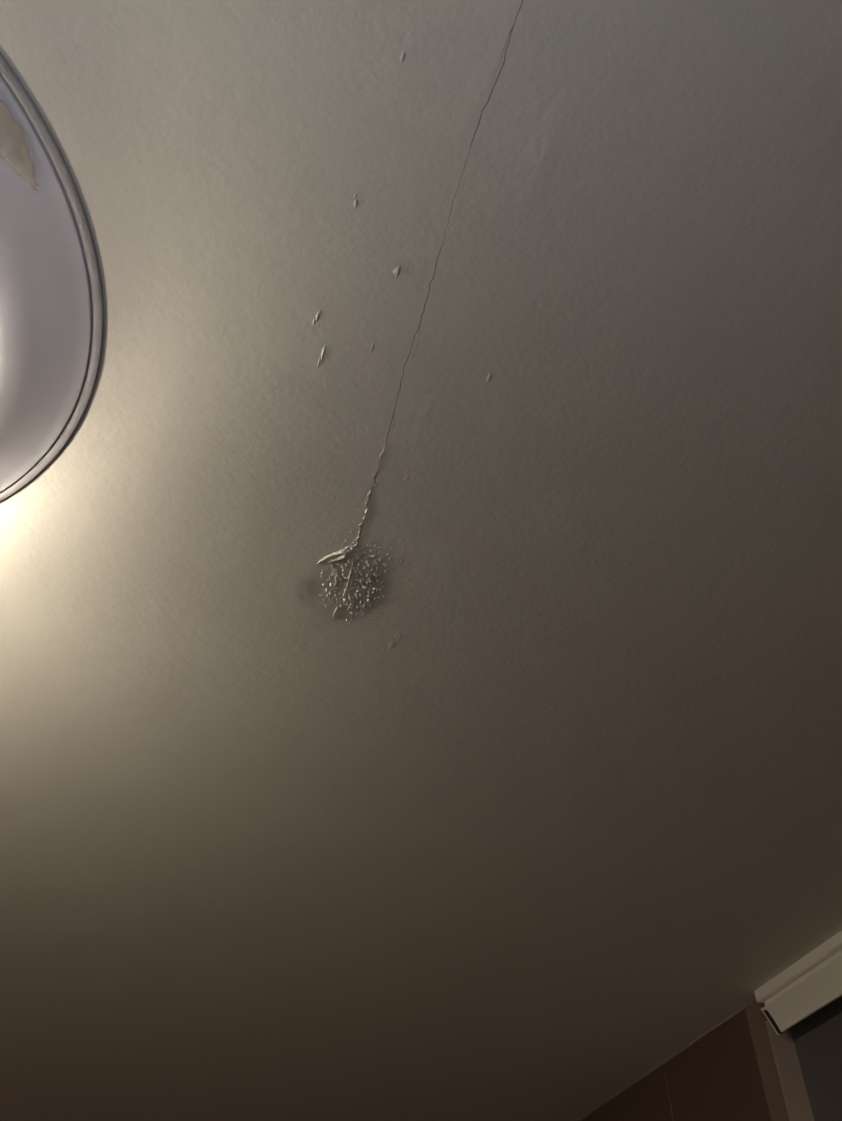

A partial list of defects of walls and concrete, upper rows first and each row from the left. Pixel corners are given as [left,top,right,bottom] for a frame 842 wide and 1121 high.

crack [354,0,523,552]
peeling [302,531,403,627]